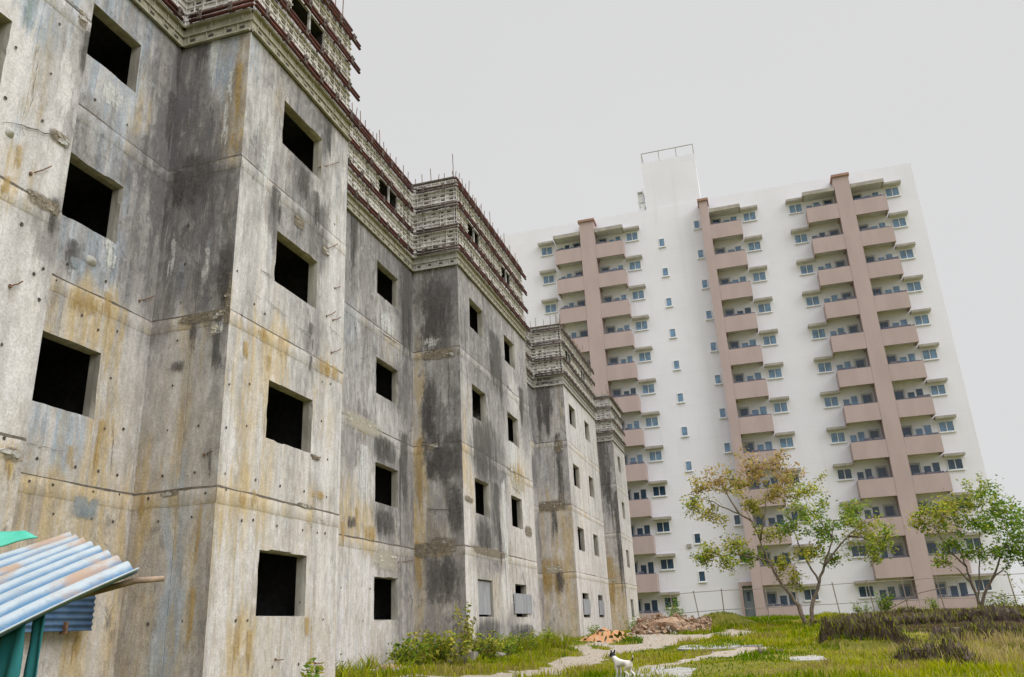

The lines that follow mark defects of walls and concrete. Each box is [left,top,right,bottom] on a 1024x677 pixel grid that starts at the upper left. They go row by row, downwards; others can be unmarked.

leakage [197,32,219,87]
leakage [166,48,182,148]
efflorescence [221,71,233,143]
spalling [27,189,59,216]
spalling [180,272,232,335]
leakage [201,247,232,367]
leakage [421,380,517,592]
leakage [536,377,565,533]
spalling [414,537,456,557]
leakage [427,558,458,602]